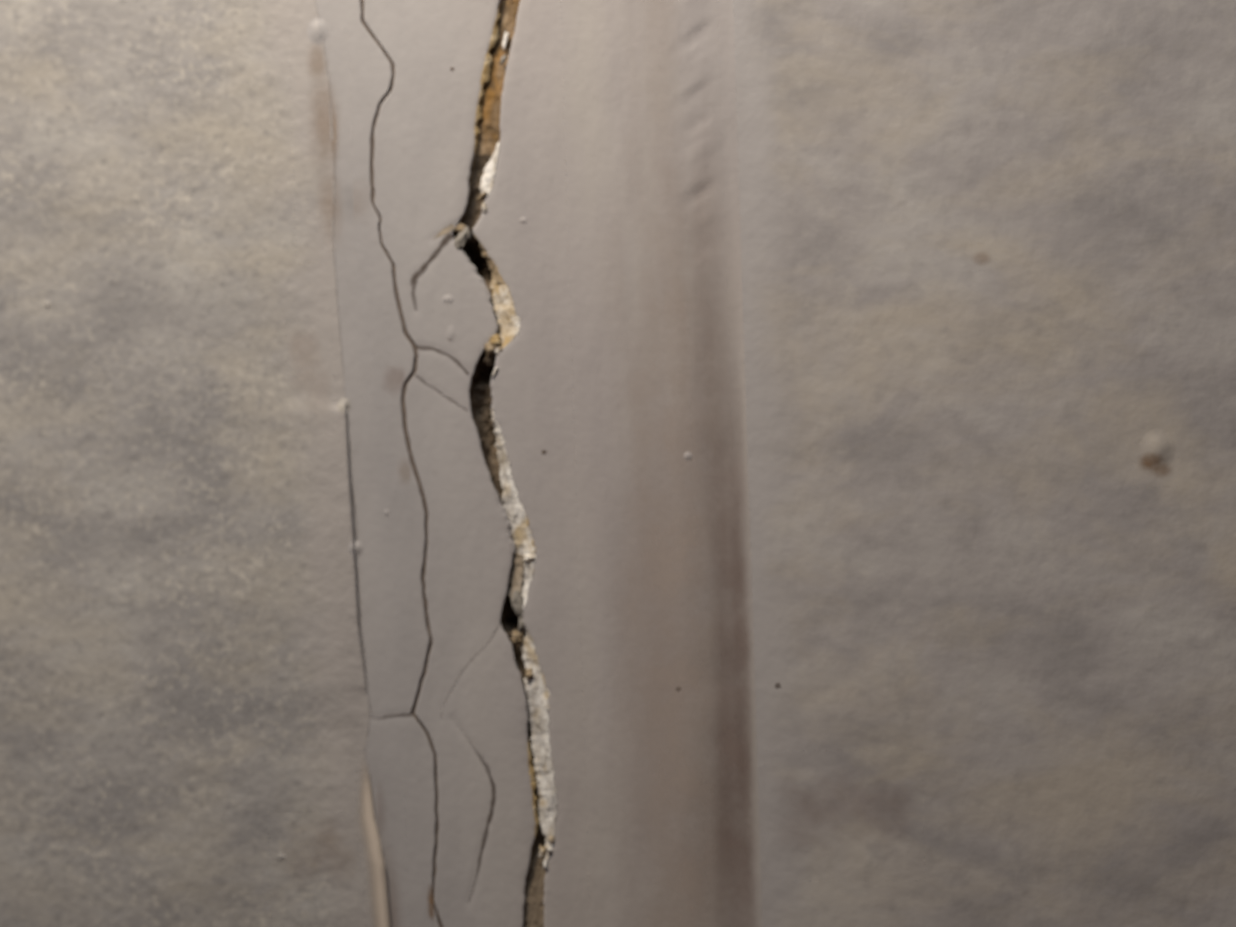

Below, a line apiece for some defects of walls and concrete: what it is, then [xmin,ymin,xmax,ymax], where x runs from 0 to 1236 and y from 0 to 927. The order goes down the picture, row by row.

crack [360,0,558,927]